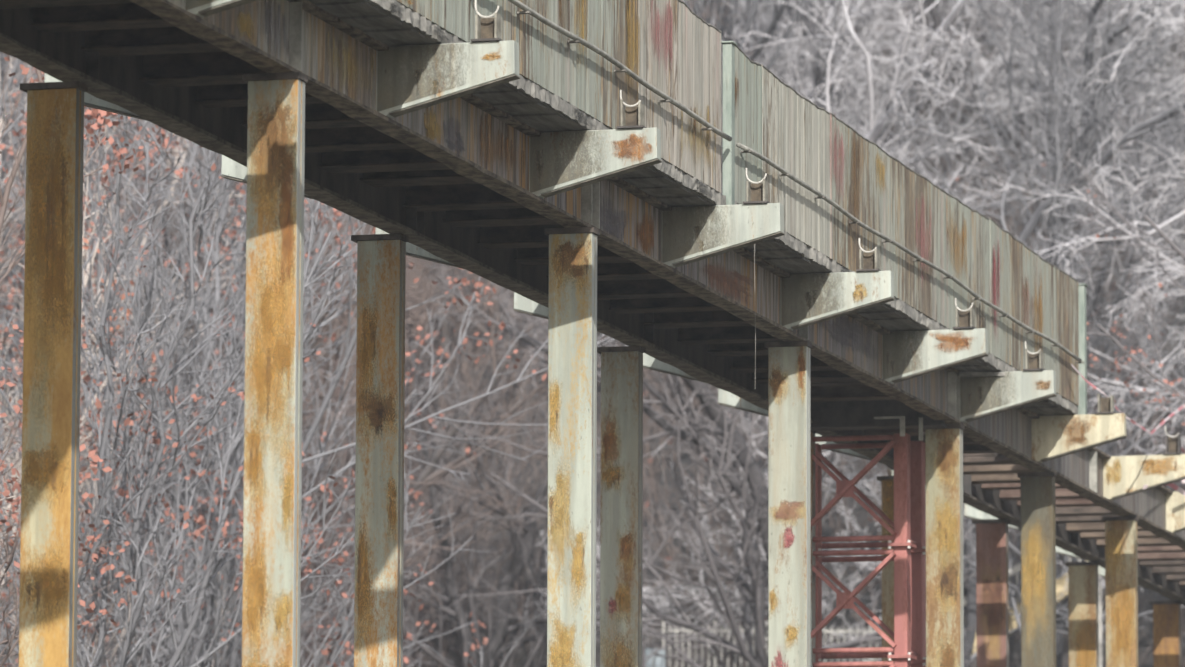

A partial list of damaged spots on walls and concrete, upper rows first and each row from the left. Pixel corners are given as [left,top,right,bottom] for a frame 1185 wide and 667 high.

corrosion [530,131,595,193]
corrosion [614,135,652,160]
corrosion [637,206,718,263]
corrosion [245,106,295,502]
corrosion [781,273,835,326]
corrosion [853,284,867,301]
corrosion [932,332,972,352]
corrosion [549,384,560,443]
corrosion [1143,458,1177,474]
corrosion [549,475,586,597]
corrosion [245,549,292,667]
corrosion [355,530,371,650]